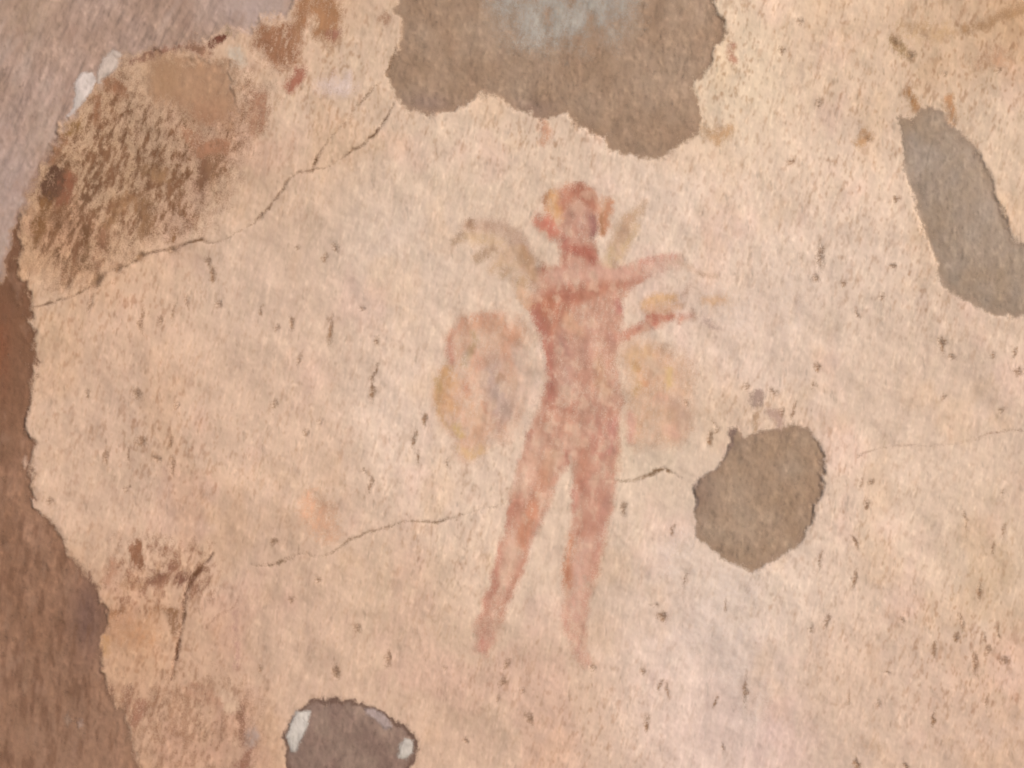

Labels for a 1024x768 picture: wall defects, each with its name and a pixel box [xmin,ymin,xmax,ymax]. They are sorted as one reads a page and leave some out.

leakage [10,0,366,298]
crack [35,47,396,309]
flaking render [0,0,299,768]
crack [251,499,515,567]
crack [566,466,682,487]
crack [171,551,238,681]
peeling [285,709,312,754]
peeling [396,738,415,760]